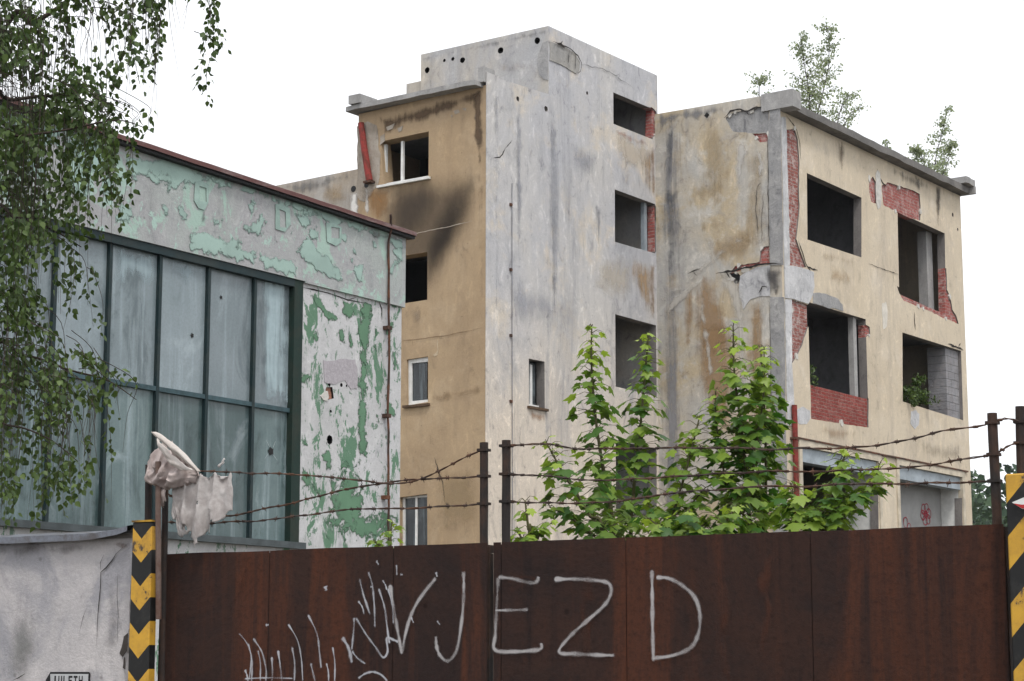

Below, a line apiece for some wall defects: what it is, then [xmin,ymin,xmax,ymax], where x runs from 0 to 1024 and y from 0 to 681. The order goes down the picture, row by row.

peeling [3,113,403,282]
leakage [385,92,482,145]
flaking render [643,107,655,138]
flaking render [647,206,655,252]
leakage [660,109,715,234]
crack [690,136,778,394]
flaking render [787,126,805,268]
flaking render [792,300,807,361]
flaking render [868,175,922,220]
flaking render [897,268,957,323]
peeling [301,294,398,548]
leakage [666,326,679,502]